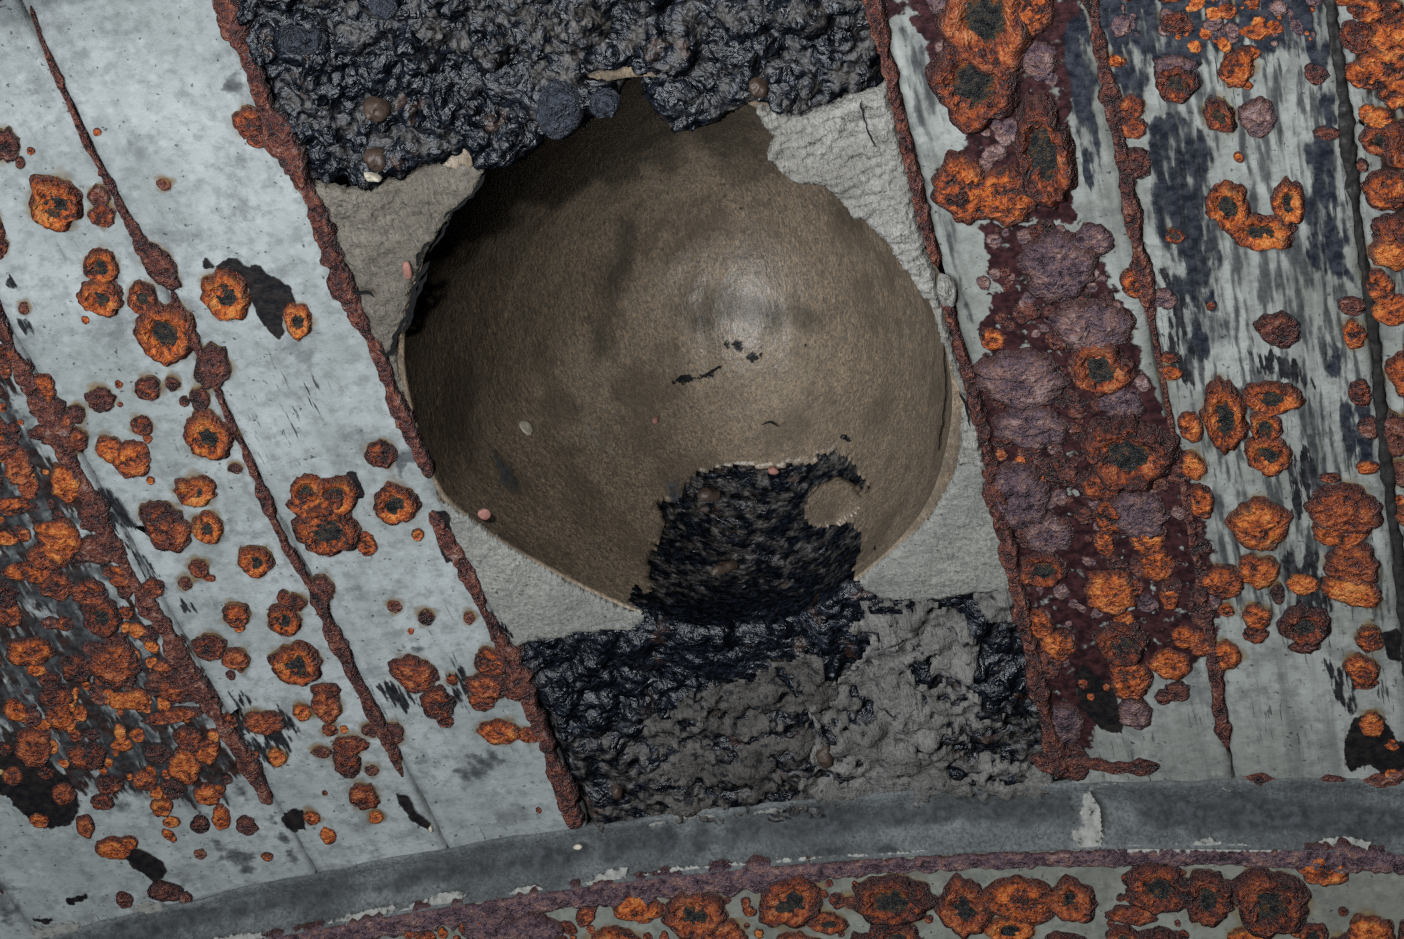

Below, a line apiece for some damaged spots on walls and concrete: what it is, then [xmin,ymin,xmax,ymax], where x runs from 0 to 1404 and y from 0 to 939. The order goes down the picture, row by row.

spalling [364,172,382,182]
damp [1063,0,1127,191]
damp [1292,0,1355,285]
damp [1148,111,1222,388]
corrosion [0,0,585,860]
corrosion [862,0,1404,782]
peeling [807,476,861,527]
damp [1323,653,1404,774]
damp [0,748,79,829]
peeling [396,793,433,833]
corrosion [116,879,193,909]
corrosion [262,837,1404,939]